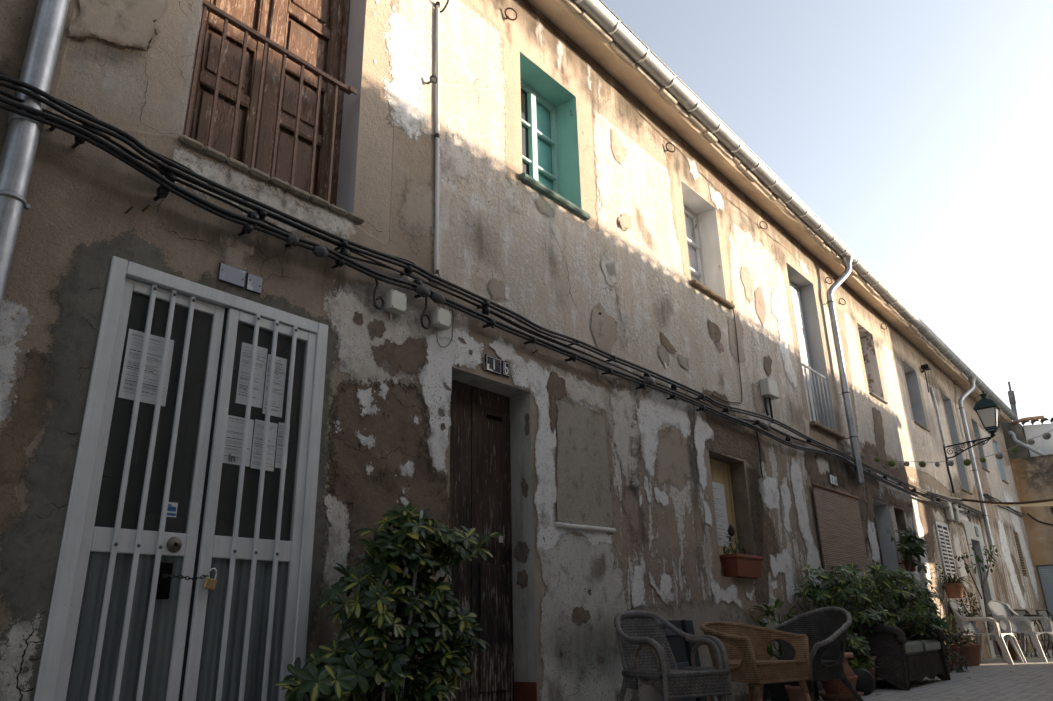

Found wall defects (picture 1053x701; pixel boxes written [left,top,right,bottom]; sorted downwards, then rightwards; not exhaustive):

peeling [373,0,426,143]
spalling [618,212,632,231]
peeling [687,157,724,215]
peeling [0,299,33,427]
spalling [708,319,724,355]
peeling [323,280,613,599]
peeling [591,303,714,608]
spalling [572,607,591,625]